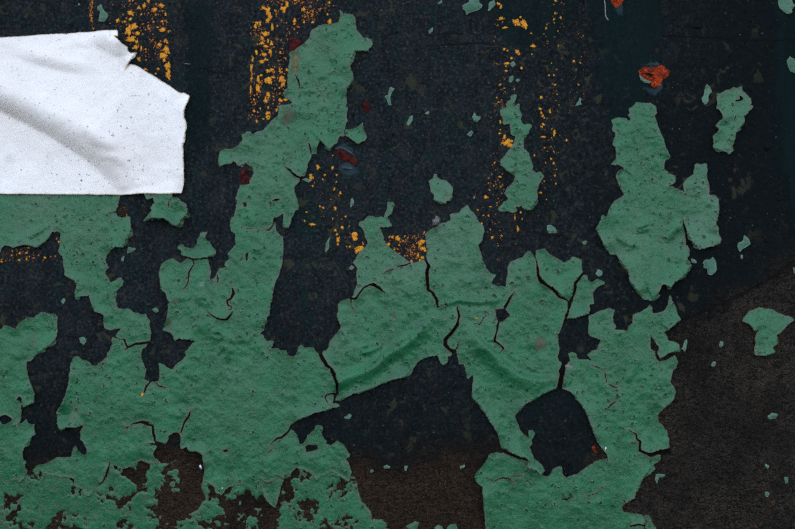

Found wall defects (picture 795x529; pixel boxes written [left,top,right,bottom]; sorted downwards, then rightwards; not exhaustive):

rust [611,0,623,15]
rust [639,62,671,95]
peeling [0,10,605,529]
peeling [737,235,750,259]
crack [350,261,515,354]
crack [536,268,585,322]
peeling [743,307,794,356]
crack [126,420,156,445]
peeling [447,296,687,529]